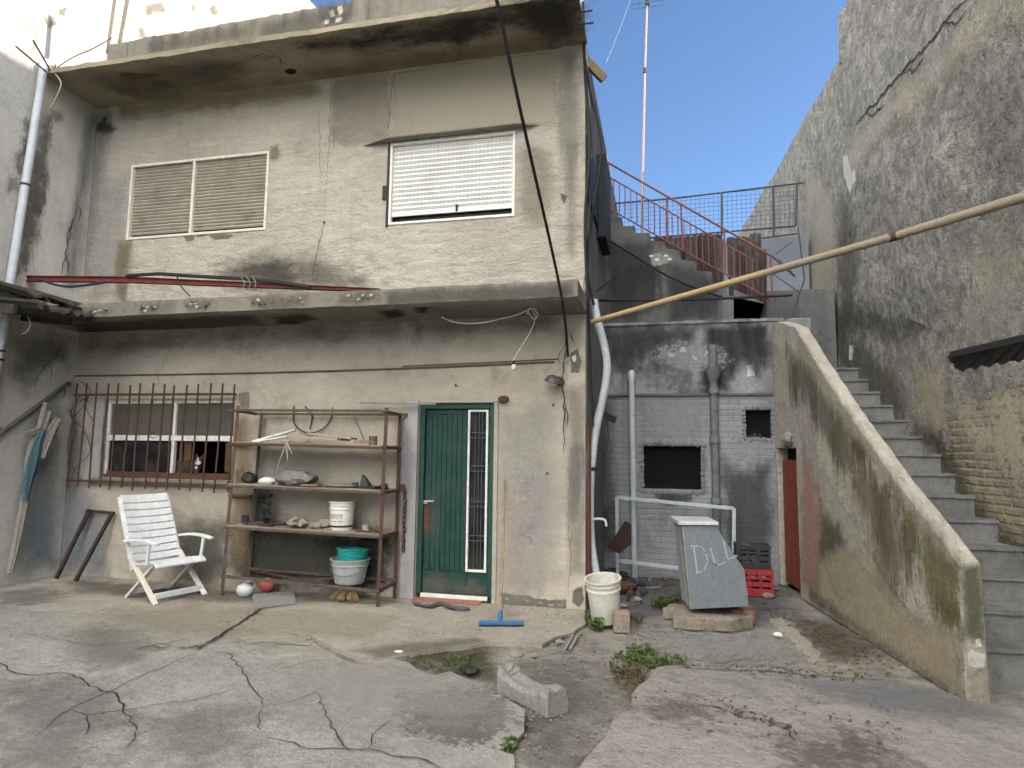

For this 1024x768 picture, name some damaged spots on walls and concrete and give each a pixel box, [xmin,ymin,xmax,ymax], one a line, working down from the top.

water stain [299,0,581,75]
crack [853,0,966,127]
spalling [843,0,1024,193]
crack [61,195,81,276]
water stain [670,267,765,392]
water stain [835,306,923,406]
water stain [785,349,912,593]
crack [0,605,440,768]
water stain [790,592,882,660]
peeling [819,541,986,694]